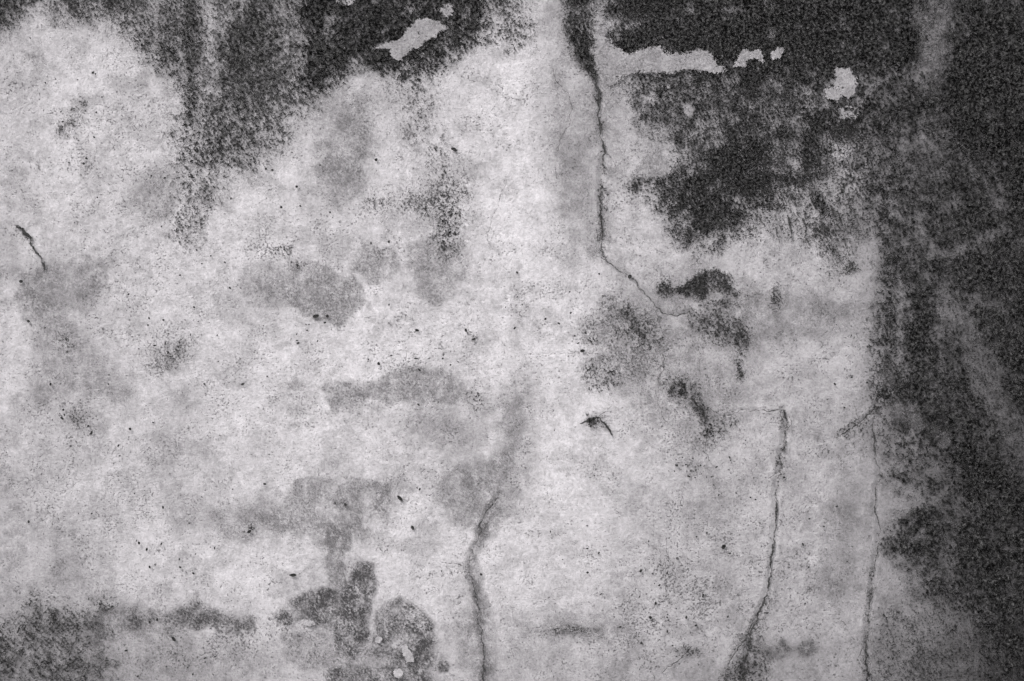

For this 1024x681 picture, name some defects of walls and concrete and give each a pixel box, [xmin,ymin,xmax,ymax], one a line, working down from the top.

damp [0,0,536,257]
peeling [373,3,454,61]
peeling [630,149,674,182]
peeling [590,3,785,87]
crack [548,62,792,681]
damp [561,0,1024,681]
damp [240,481,449,681]
crack [445,498,497,680]